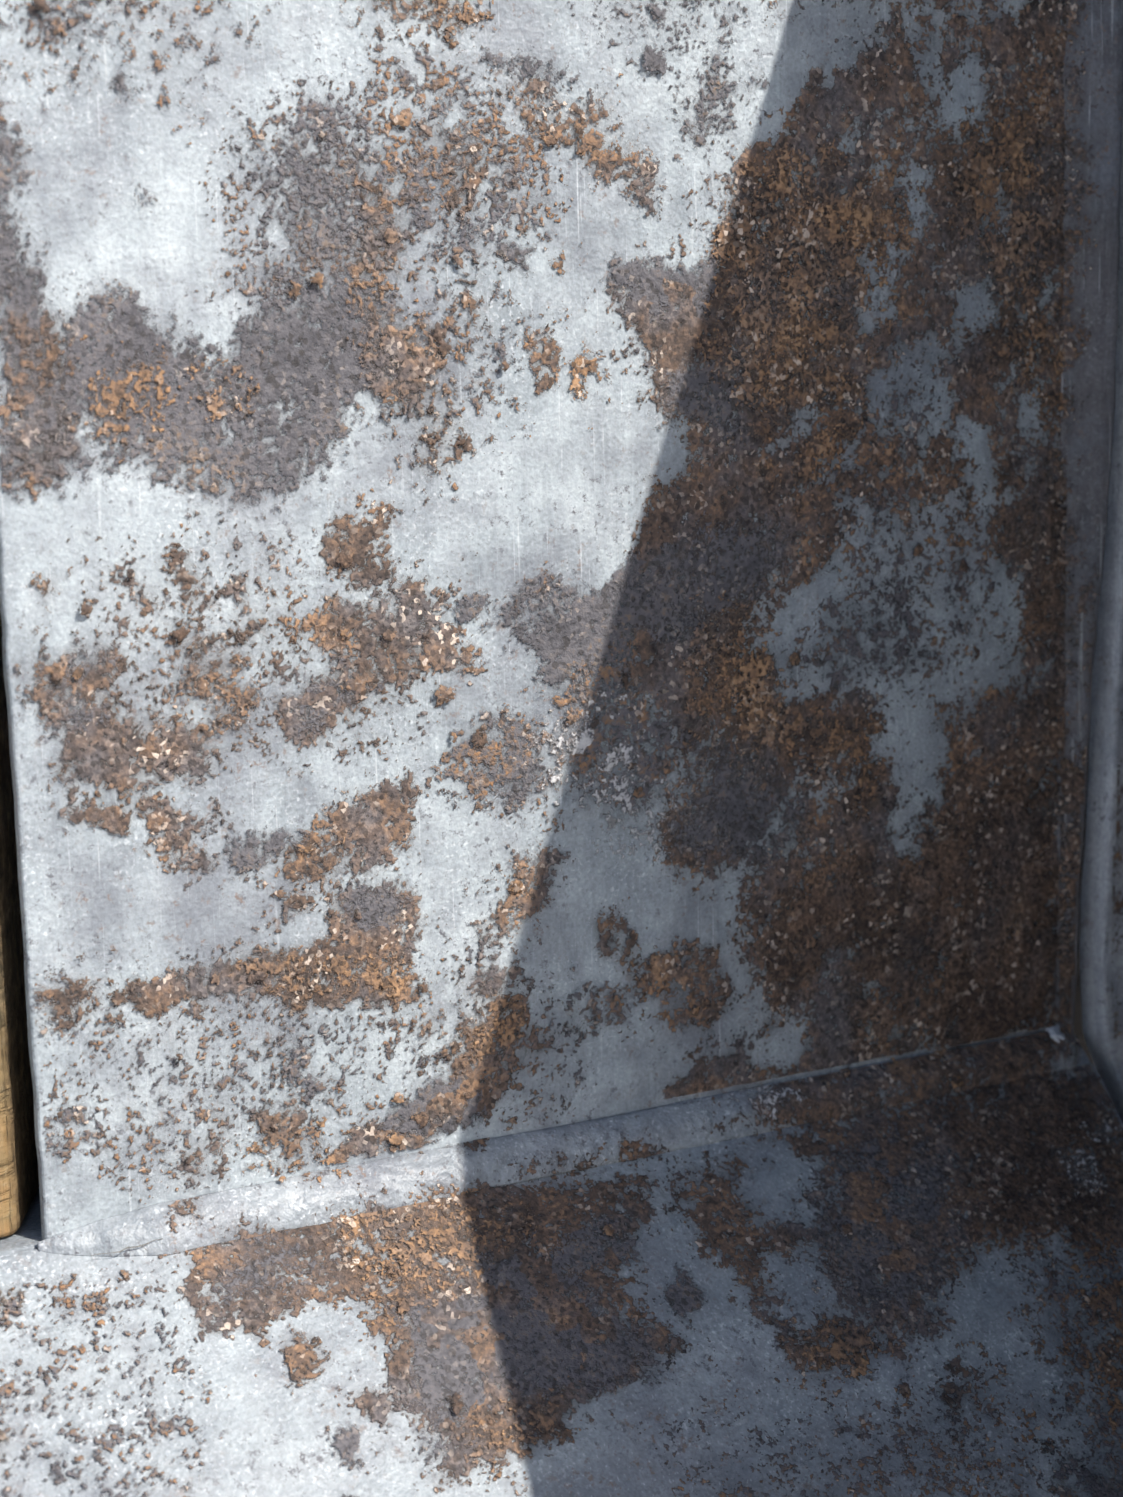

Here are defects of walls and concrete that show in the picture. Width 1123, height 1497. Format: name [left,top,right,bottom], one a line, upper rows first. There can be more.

rust [0,0,283,297]
rust [548,250,566,276]
rust [26,571,60,613]
rust [76,580,99,621]
rust [1111,760,1123,1039]
rust [0,1264,212,1497]